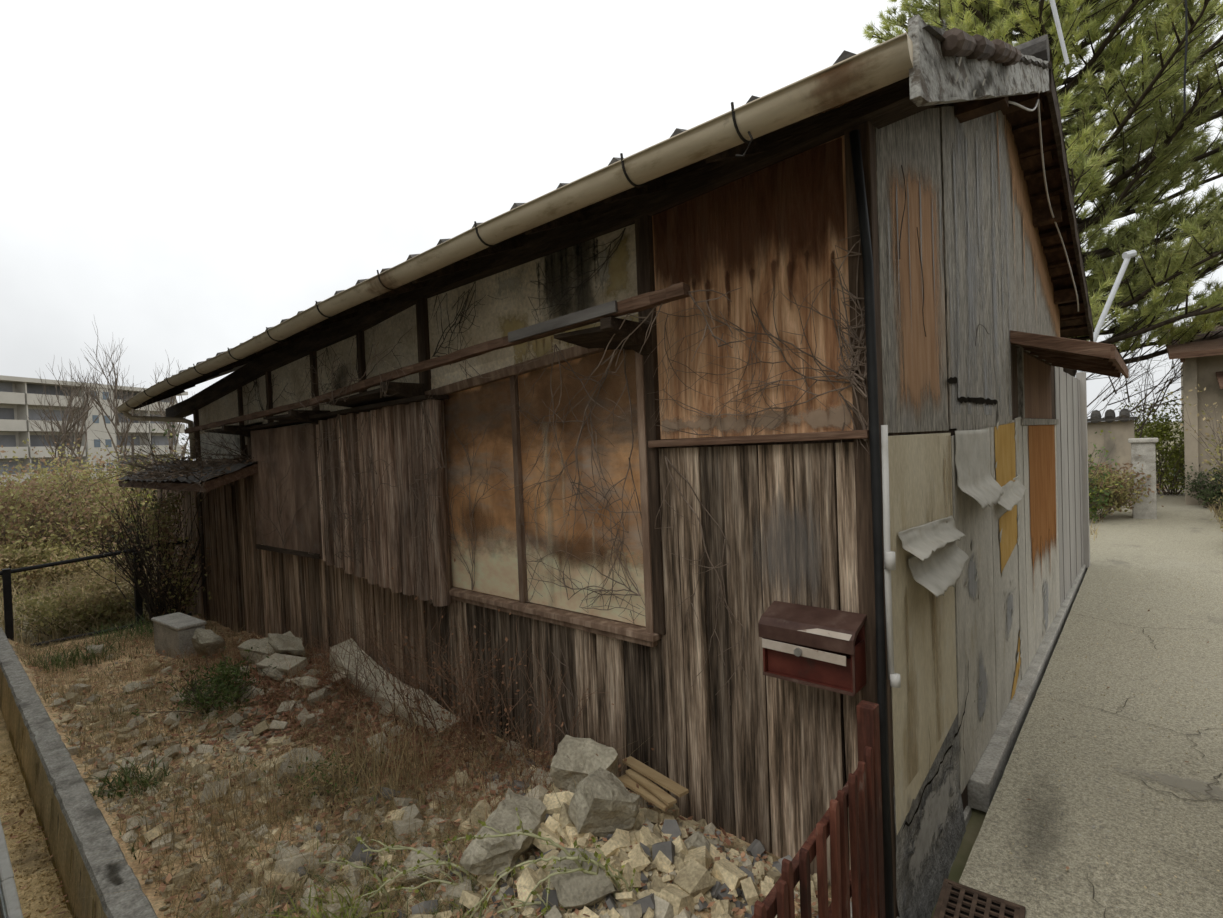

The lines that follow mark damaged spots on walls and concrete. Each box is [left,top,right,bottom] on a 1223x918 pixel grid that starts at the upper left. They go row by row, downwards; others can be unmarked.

leakage [537,238,599,318]
spalling [906,738,961,907]